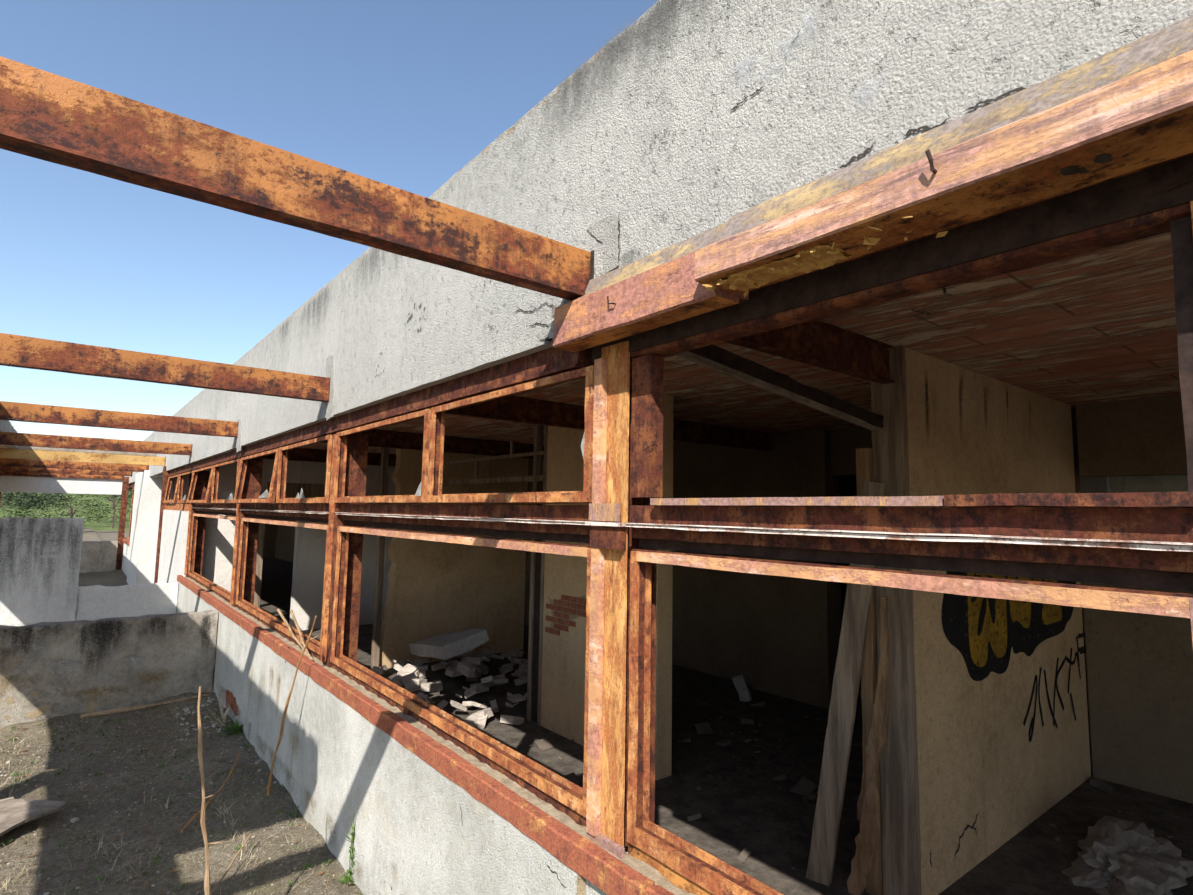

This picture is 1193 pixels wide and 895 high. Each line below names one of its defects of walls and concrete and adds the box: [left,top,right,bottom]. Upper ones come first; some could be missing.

peeling [863,226,882,251]
peeling [702,242,853,297]
water stain [0,517,79,579]
water stain [3,626,43,649]
water stain [81,620,124,658]
water stain [201,616,211,643]
flaking render [545,595,586,636]